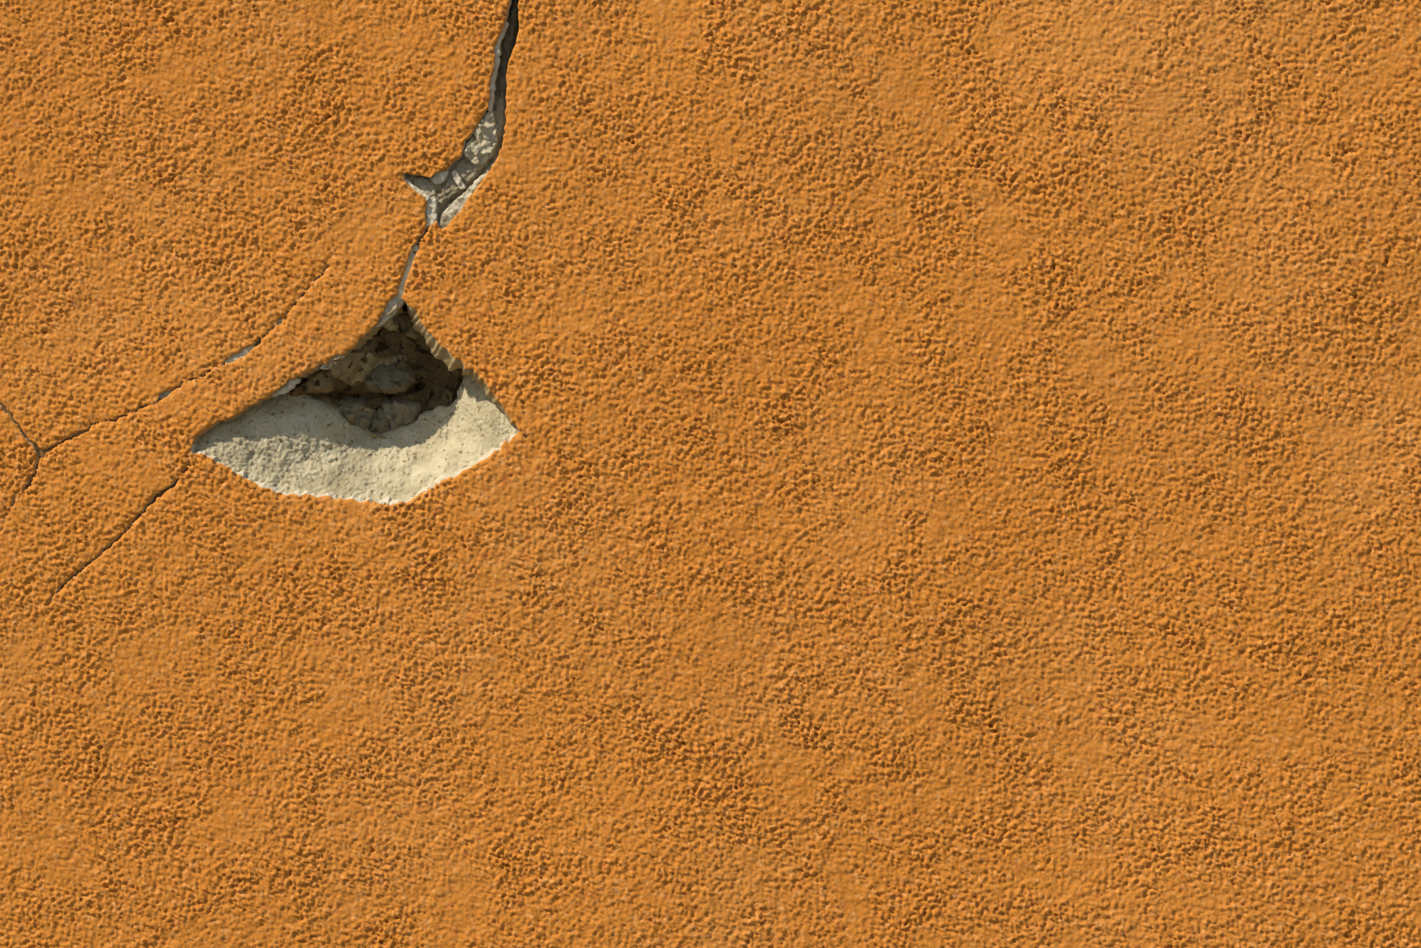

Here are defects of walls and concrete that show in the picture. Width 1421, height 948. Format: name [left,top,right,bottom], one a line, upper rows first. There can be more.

crack [396,0,519,299]
crack [0,263,329,506]
flaking render [191,295,520,505]
crack [51,470,186,600]